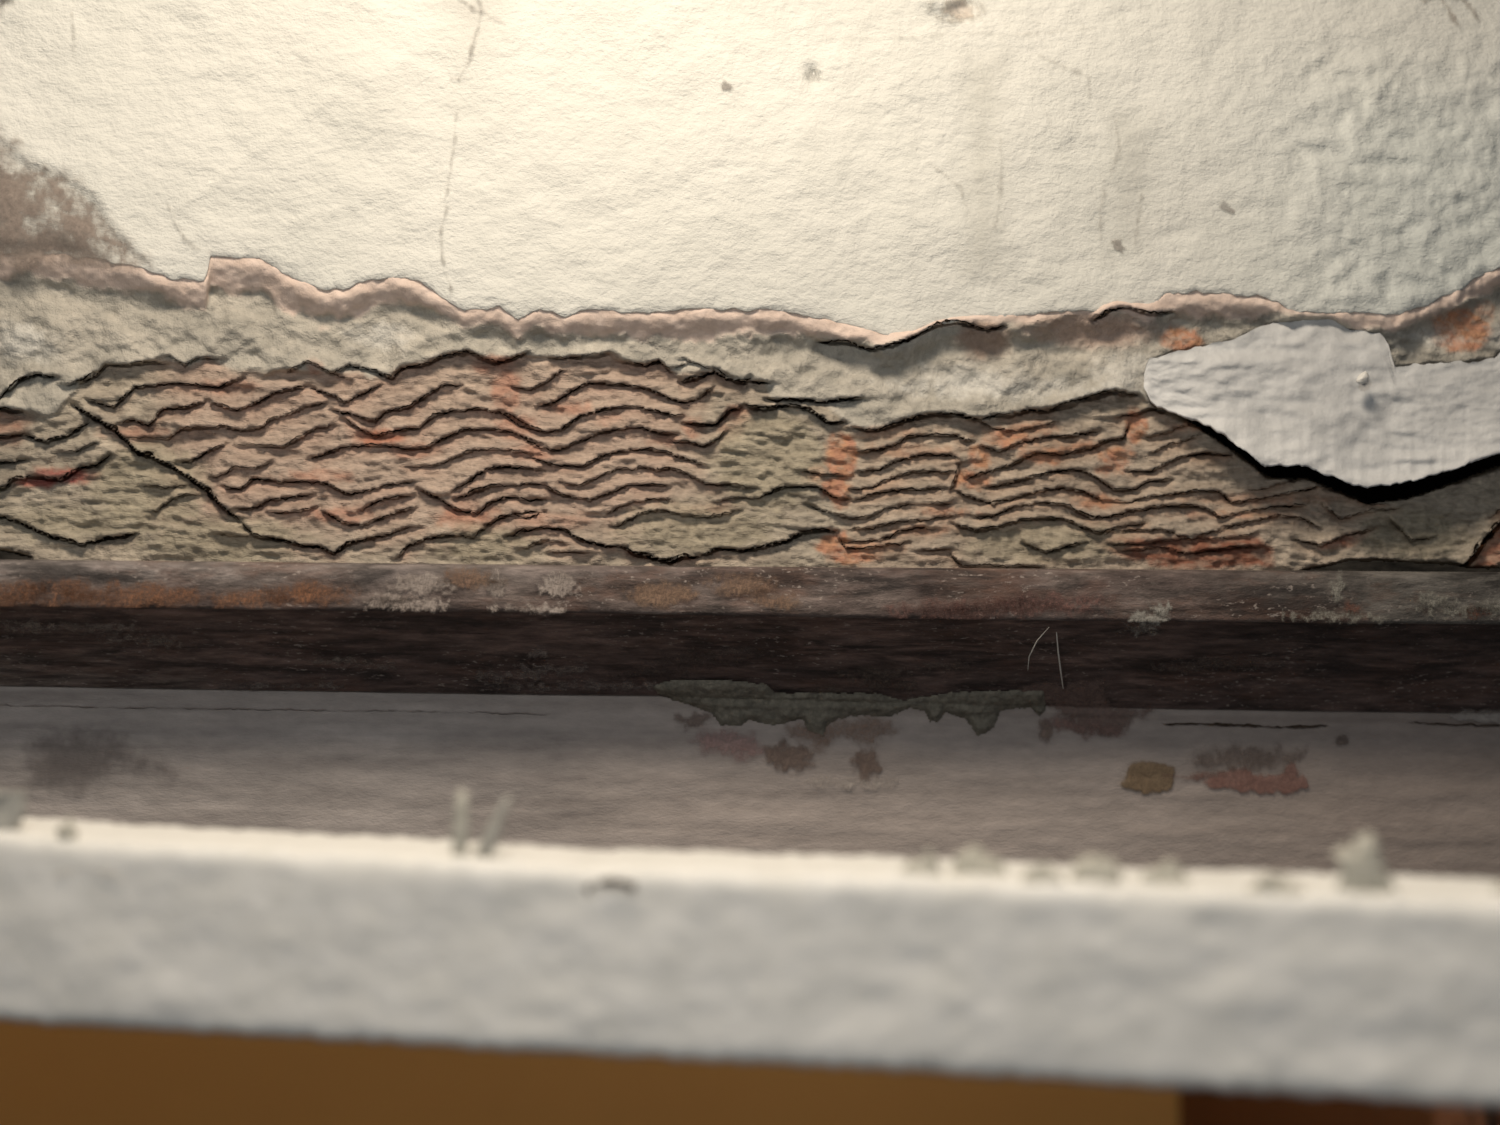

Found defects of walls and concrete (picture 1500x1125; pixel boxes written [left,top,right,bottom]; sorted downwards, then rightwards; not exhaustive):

spalling [0,254,1500,571]